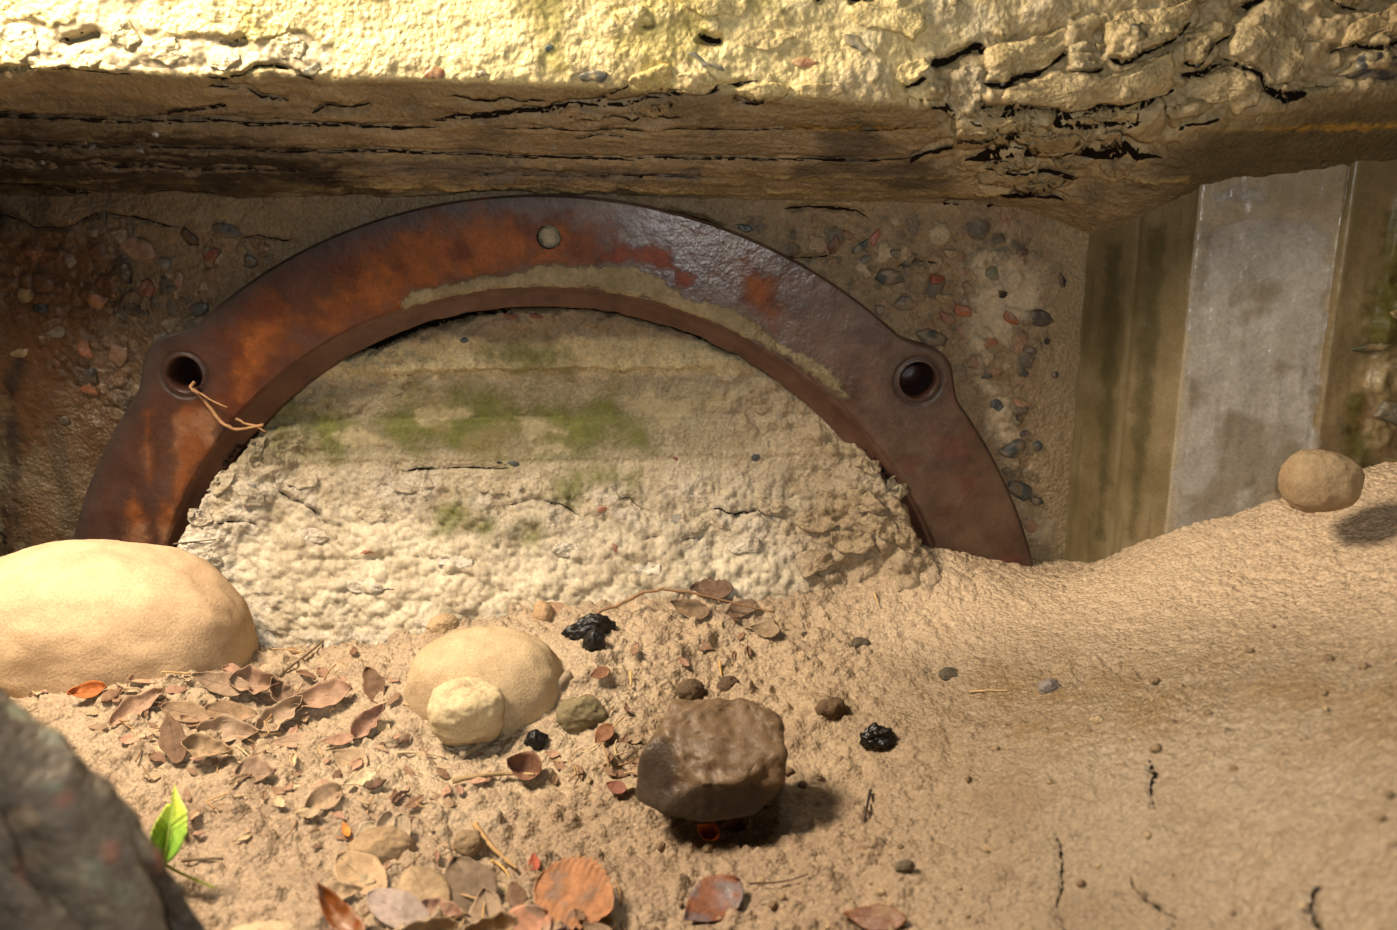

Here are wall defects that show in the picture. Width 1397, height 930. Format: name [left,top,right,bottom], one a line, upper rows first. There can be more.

crack [0,32,129,75]
peeling [0,0,337,77]
crack [0,64,925,229]
crack [698,34,725,44]
peeling [736,56,846,105]
peeling [841,0,928,55]
spalling [895,0,1397,209]
corrosion [313,216,696,332]
corrosion [223,297,289,406]
corrosion [126,405,218,546]
water stain [314,417,359,454]
water stain [225,470,800,648]